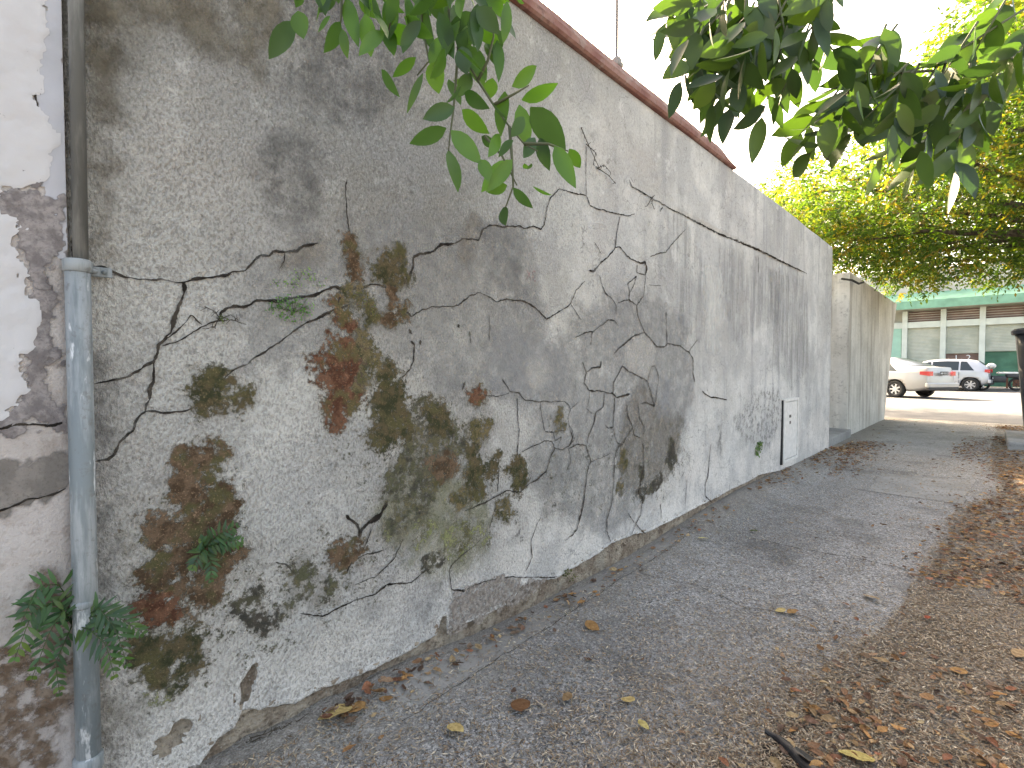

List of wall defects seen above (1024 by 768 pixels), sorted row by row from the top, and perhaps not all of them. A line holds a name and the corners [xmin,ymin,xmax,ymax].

crack [0,422,62,430]
crack [0,488,66,512]
peeling [0,0,68,439]
crack [300,502,423,617]
leakage [253,215,540,406]
crack [70,180,807,592]
leakage [530,298,690,530]